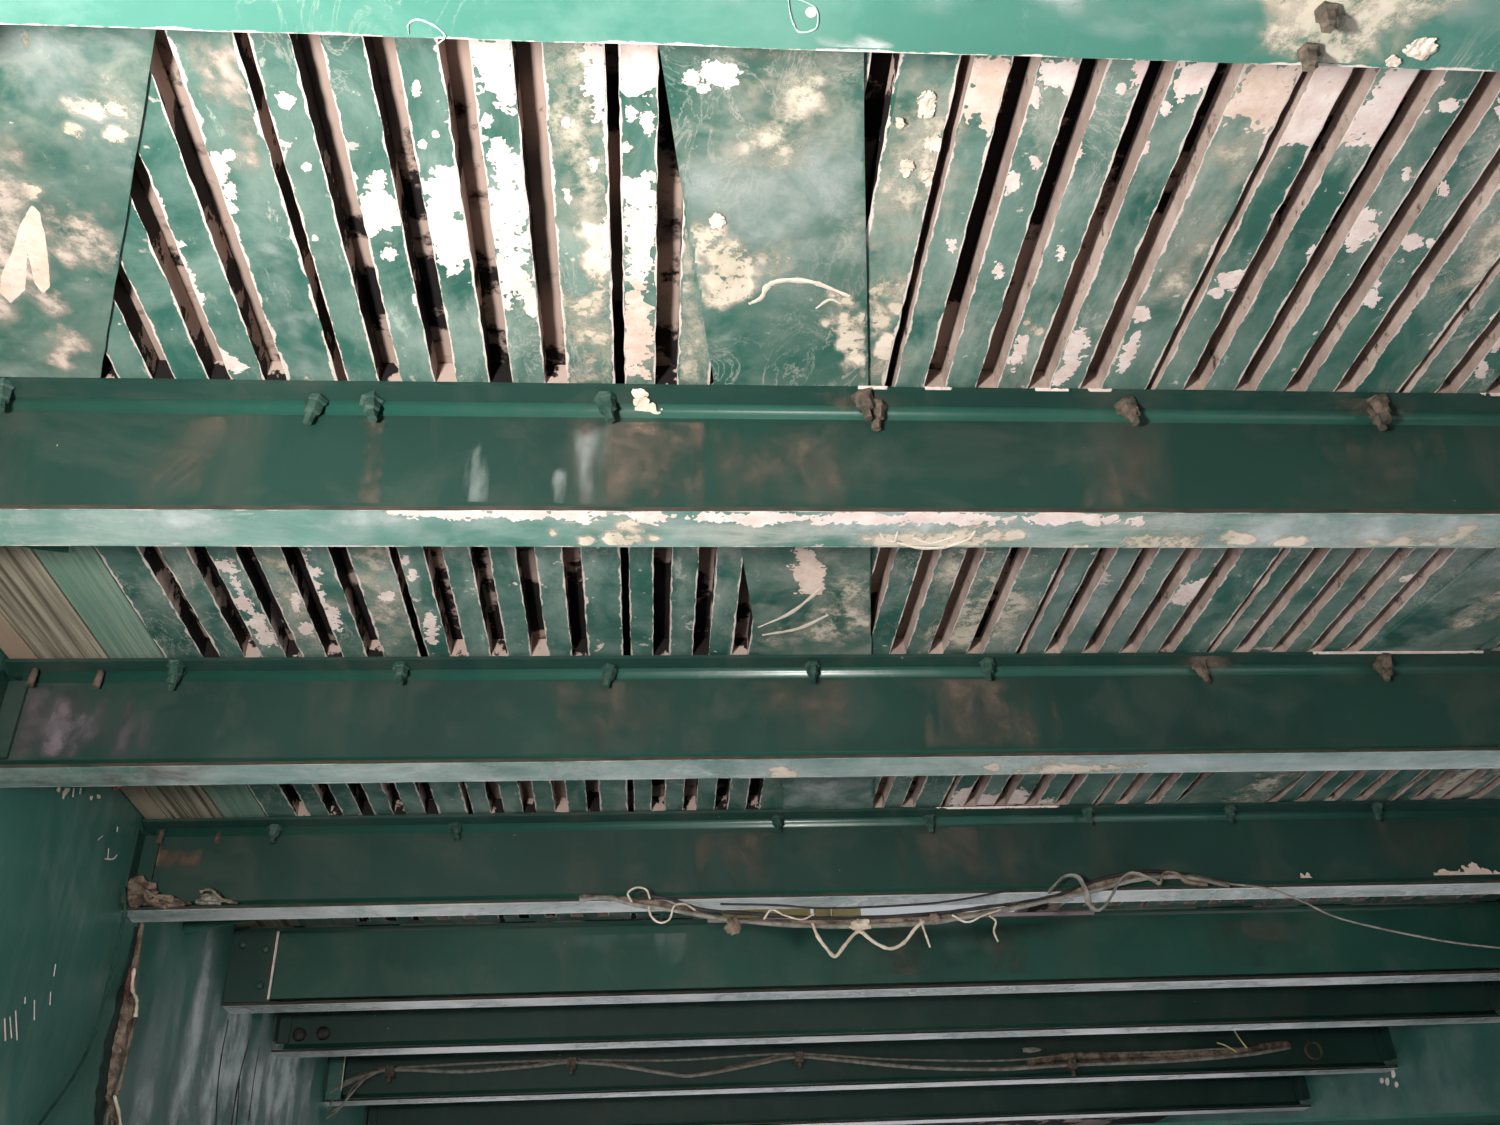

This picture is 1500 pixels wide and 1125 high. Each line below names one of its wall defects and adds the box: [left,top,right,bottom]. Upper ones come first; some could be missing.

peeling [577,43,657,153]
peeling [963,55,1011,137]
peeling [1030,58,1079,109]
peeling [1160,61,1217,117]
peeling [1223,64,1353,147]
peeling [1342,68,1419,147]
peeling [0,206,50,303]
peeling [353,169,401,262]
peeling [421,165,470,278]
peeling [469,39,538,318]
peeling [598,170,656,380]
peeling [386,511,1145,528]